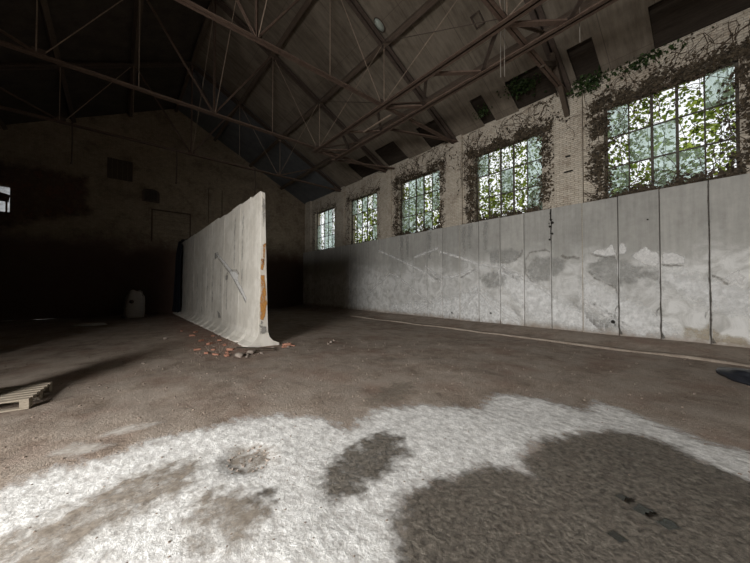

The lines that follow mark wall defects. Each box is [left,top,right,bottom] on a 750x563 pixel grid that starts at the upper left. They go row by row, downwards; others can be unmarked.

water stain [369,235,673,336]